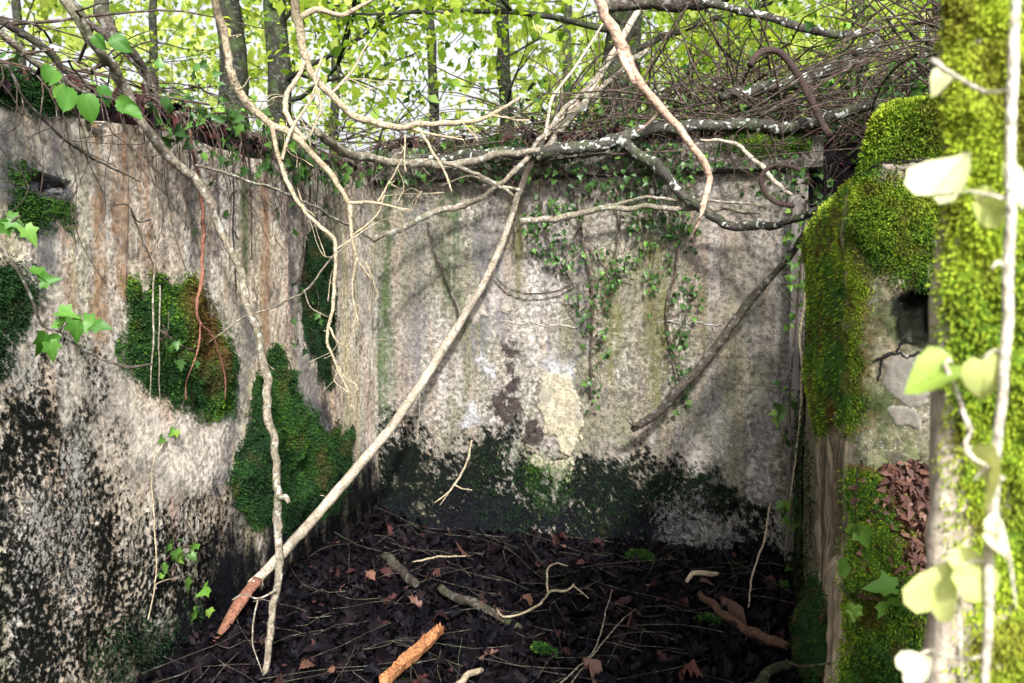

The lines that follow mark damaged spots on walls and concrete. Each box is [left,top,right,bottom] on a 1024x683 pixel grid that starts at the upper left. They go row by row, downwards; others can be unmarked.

leakage [186,178,222,310]
leakage [2,331,35,393]
leakage [10,364,95,597]
leakage [115,297,128,333]
leakage [310,381,339,435]
leakage [461,226,544,446]
peeling [530,368,584,482]
leakage [542,356,573,377]
crack [873,343,927,381]
leakage [106,403,799,683]